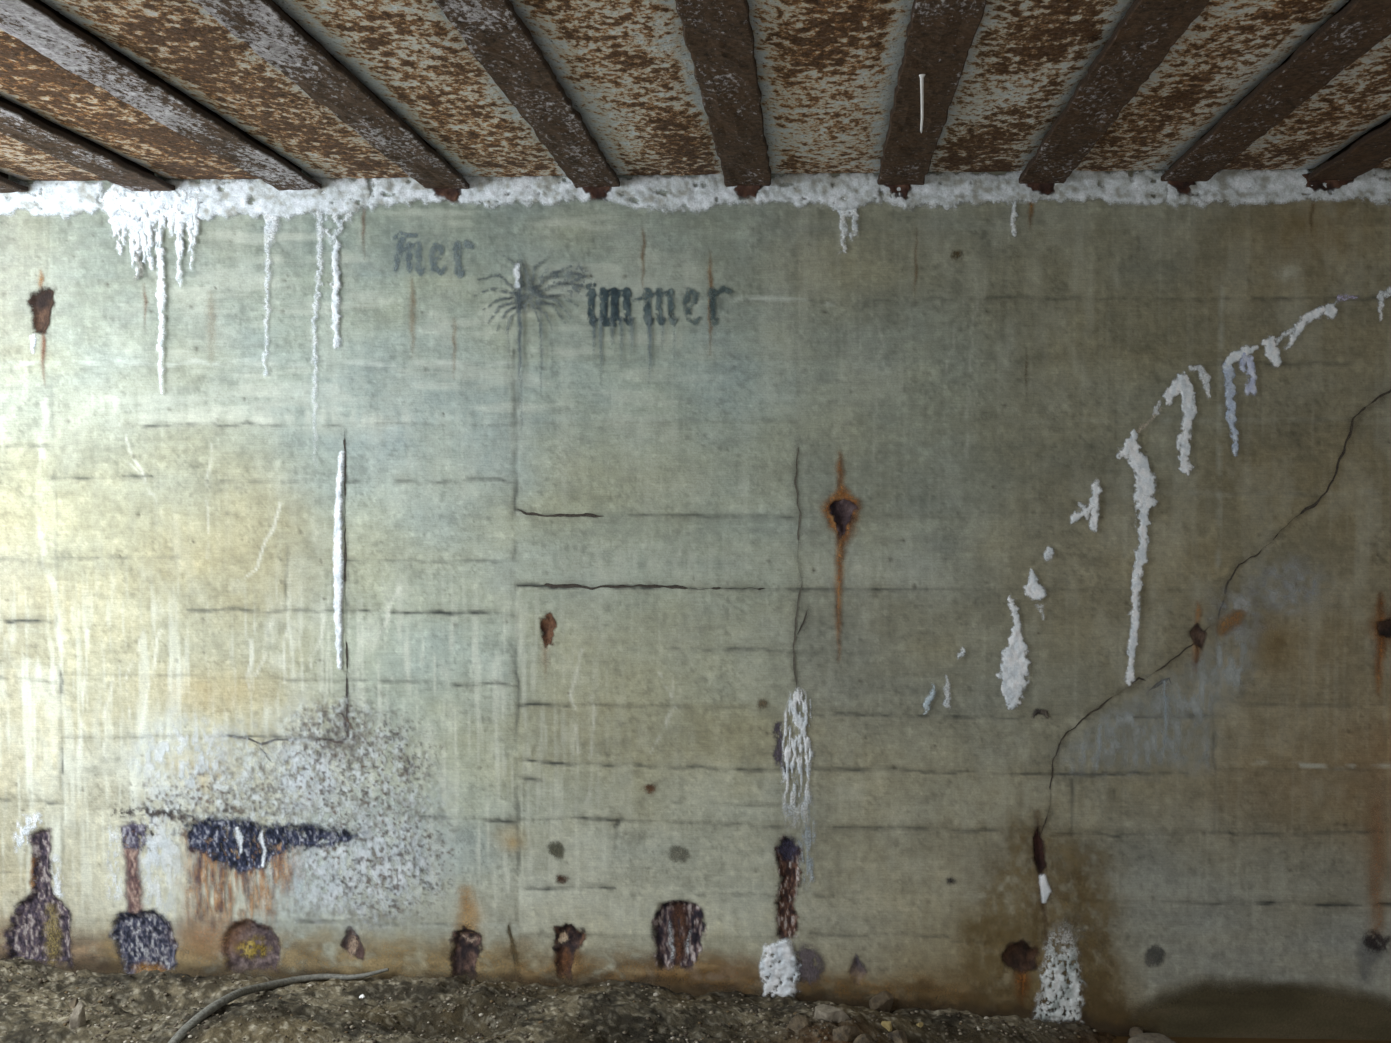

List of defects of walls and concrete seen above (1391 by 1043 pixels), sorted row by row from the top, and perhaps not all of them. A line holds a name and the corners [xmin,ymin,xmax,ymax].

rust [433,188,461,202]
rust [582,187,611,200]
rust [734,185,763,198]
rust [884,185,911,199]
damp [0,168,1391,403]
damp [333,451,344,669]
damp [996,547,1054,710]
crack [1040,390,1391,835]
damp [1116,295,1357,686]
spalling [3,813,72,967]
spalling [109,702,443,974]
spalling [652,900,706,970]